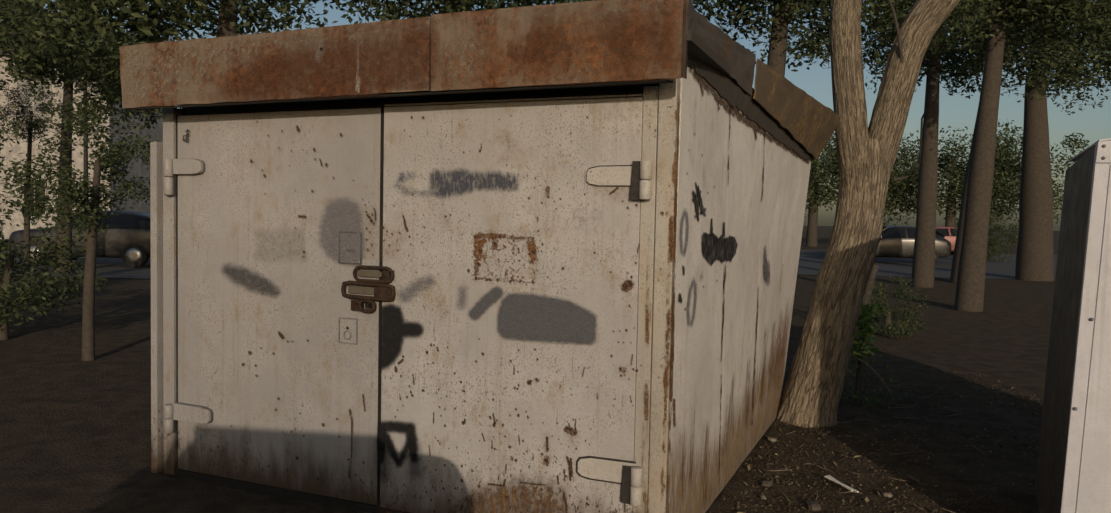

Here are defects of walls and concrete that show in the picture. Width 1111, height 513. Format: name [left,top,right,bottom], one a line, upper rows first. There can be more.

rust [467,232,539,283]
rust [661,101,784,513]